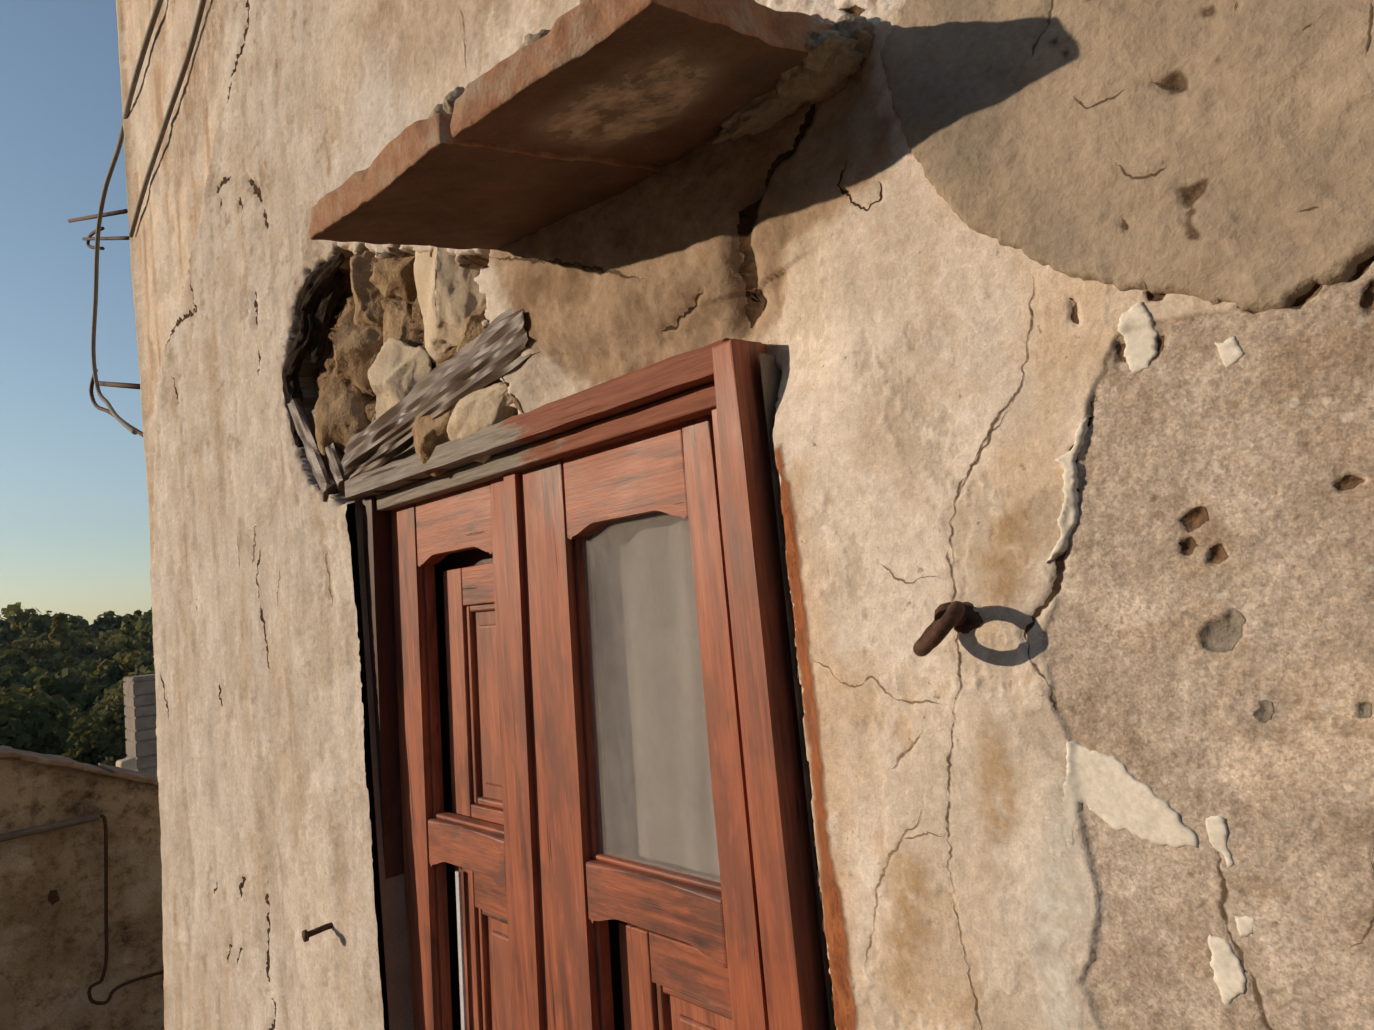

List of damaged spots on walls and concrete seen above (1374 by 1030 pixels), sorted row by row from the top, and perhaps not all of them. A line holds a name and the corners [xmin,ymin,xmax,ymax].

crack [227,0,250,103]
flaking render [455,253,490,286]
crack [737,104,815,328]
crack [837,169,882,211]
flaking render [282,251,356,453]
hole [1178,506,1228,564]
crack [812,279,1034,1030]
crack [1024,551,1066,713]
hole [1200,607,1245,653]
flaking render [1062,740,1234,868]
flaking render [1208,916,1255,1004]
crack [1216,852,1272,1030]